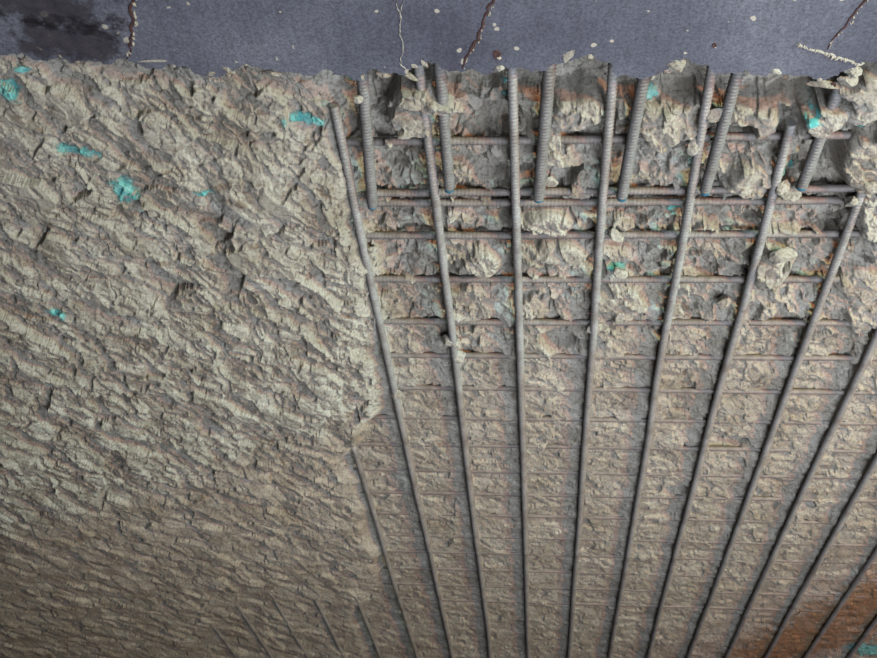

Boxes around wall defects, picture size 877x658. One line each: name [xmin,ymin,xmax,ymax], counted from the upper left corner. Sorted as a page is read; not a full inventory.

water stain [0,0,121,63]
crack [126,0,138,60]
crack [396,0,406,70]
crack [462,0,495,70]
crack [797,0,868,66]
water stain [0,66,30,100]
spalling [440,68,543,231]
spalling [520,50,877,658]